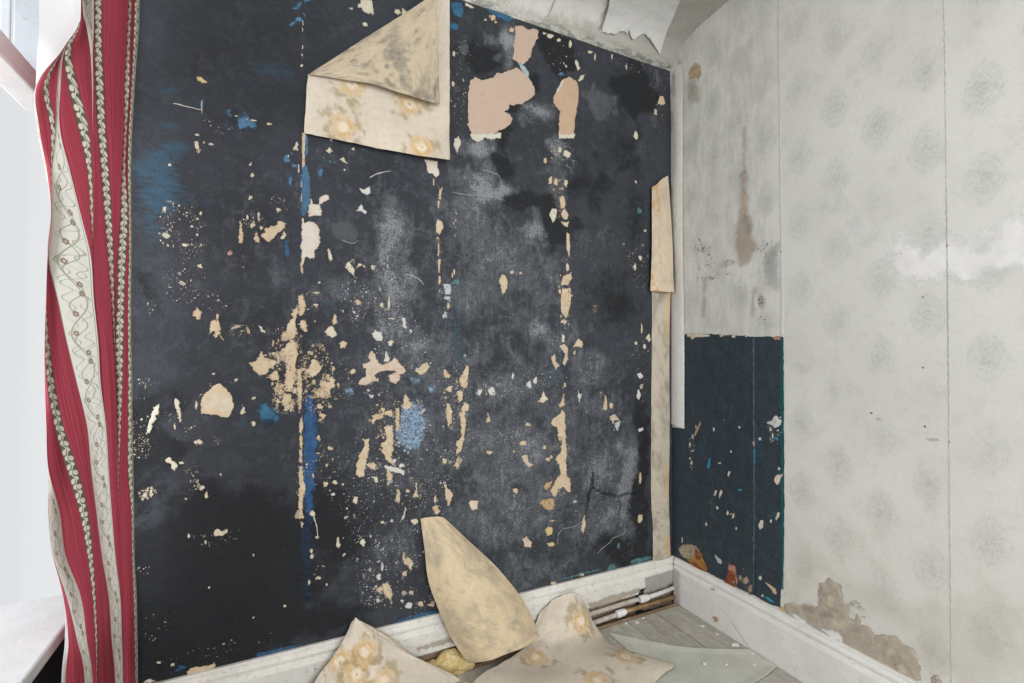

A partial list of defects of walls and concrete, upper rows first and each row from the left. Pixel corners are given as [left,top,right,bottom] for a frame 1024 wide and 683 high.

peeling [350,0,374,26]
peeling [450,2,596,167]
leakage [696,192,782,281]
peeling [158,159,609,617]
peeling [753,416,782,463]
flaking render [752,511,942,683]